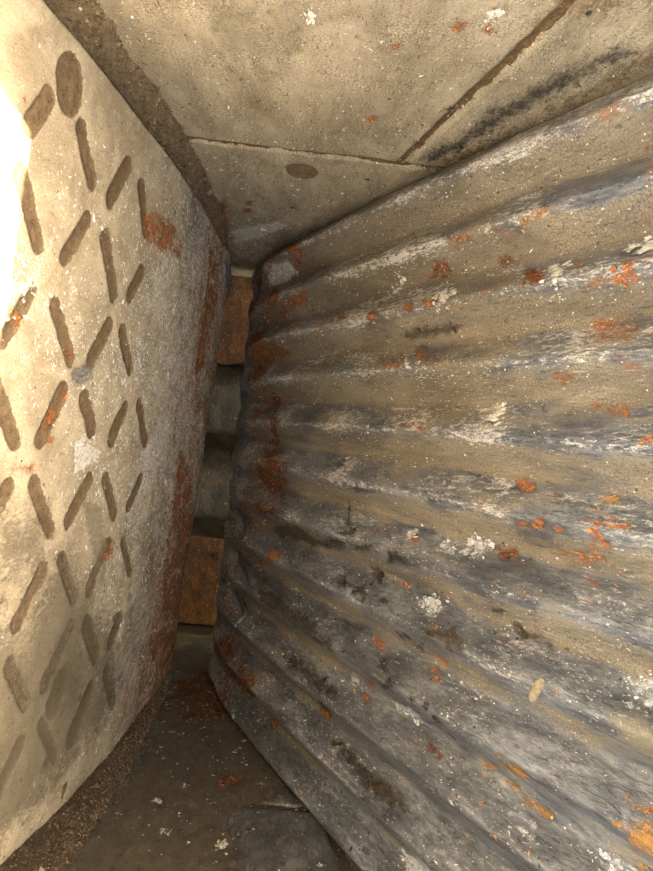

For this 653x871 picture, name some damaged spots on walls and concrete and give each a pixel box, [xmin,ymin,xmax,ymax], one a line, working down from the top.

rust [126,198,238,715]
rust [234,393,297,519]
rust [626,793,653,871]